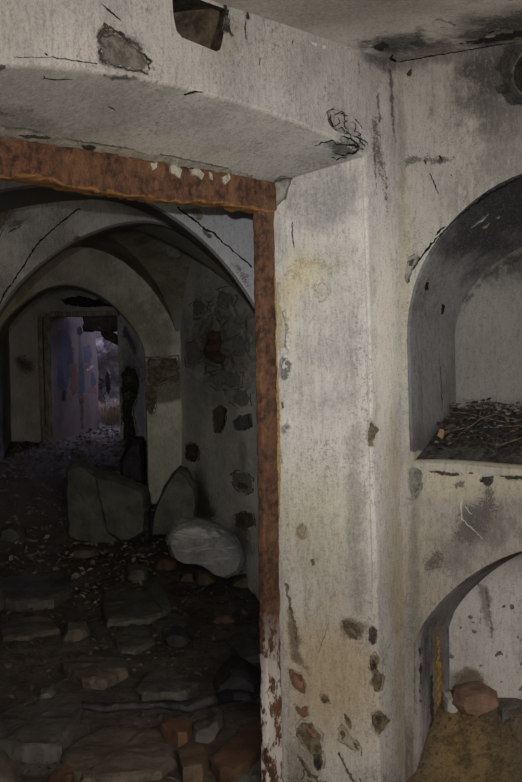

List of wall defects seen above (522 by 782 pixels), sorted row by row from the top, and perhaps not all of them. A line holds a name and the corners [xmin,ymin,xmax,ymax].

crack [18,53,97,80]
flaking render [96,22,153,75]
damp [361,29,427,53]
damp [459,30,522,45]
crack [315,136,368,161]
crack [0,208,81,304]
crack [177,207,252,268]
flaking render [120,355,181,441]
flaking render [341,619,385,692]
flaking render [287,668,326,782]
flaking render [370,709,391,737]
crack [338,752,361,782]